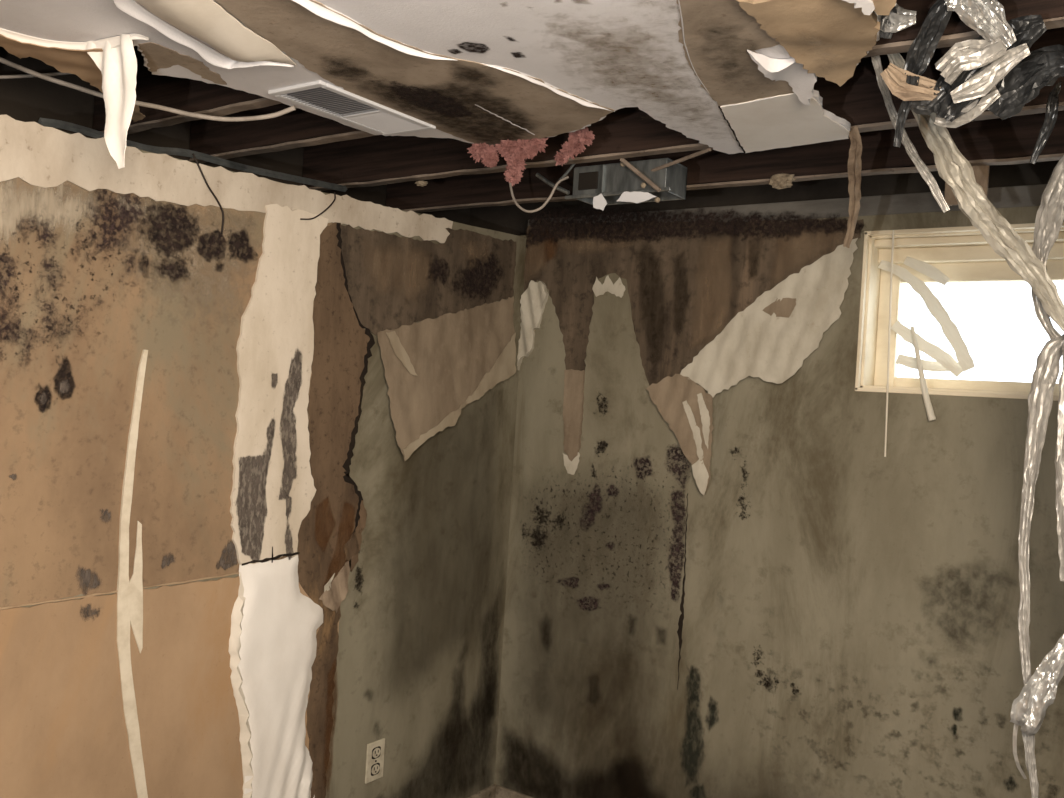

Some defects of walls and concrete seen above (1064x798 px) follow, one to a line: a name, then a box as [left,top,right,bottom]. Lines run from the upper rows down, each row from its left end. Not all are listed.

peeling [138,42,227,85]
peeling [215,0,615,145]
leakage [330,61,532,143]
leakage [448,42,489,54]
peeling [676,0,794,106]
leakage [76,189,257,301]
leakage [526,206,863,350]
leakage [35,359,75,413]
crack [336,223,375,534]
peeling [0,115,864,798]
leakage [522,441,690,611]
leakage [682,667,717,798]